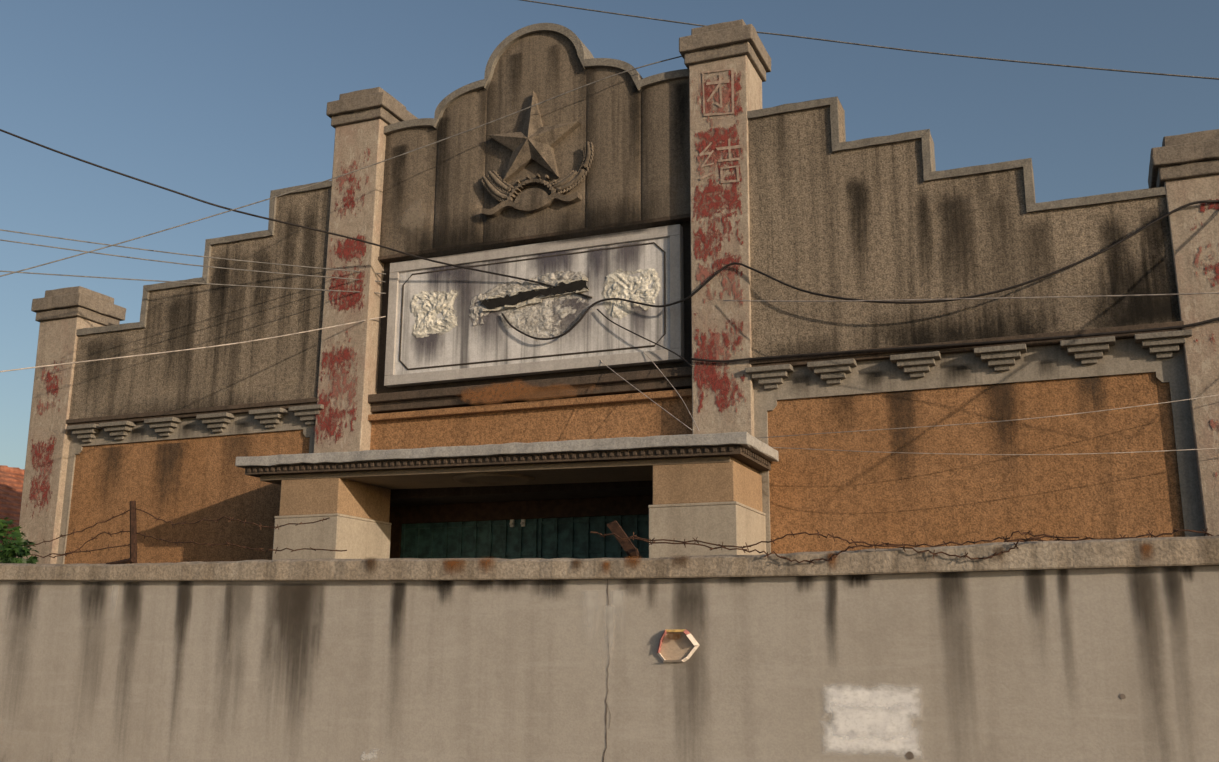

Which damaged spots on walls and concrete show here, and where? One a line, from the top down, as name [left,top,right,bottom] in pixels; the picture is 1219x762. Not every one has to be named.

peeling [334,147,370,216]
peeling [314,233,366,445]
spalling [410,268,661,342]
peeling [692,70,746,413]
water stain [1097,216,1176,328]
peeling [26,435,57,519]
water stain [179,581,190,621]
water stain [275,585,311,663]
water stain [393,583,405,623]
water stain [942,572,960,590]
water stain [1166,566,1192,596]
crack [602,579,610,762]